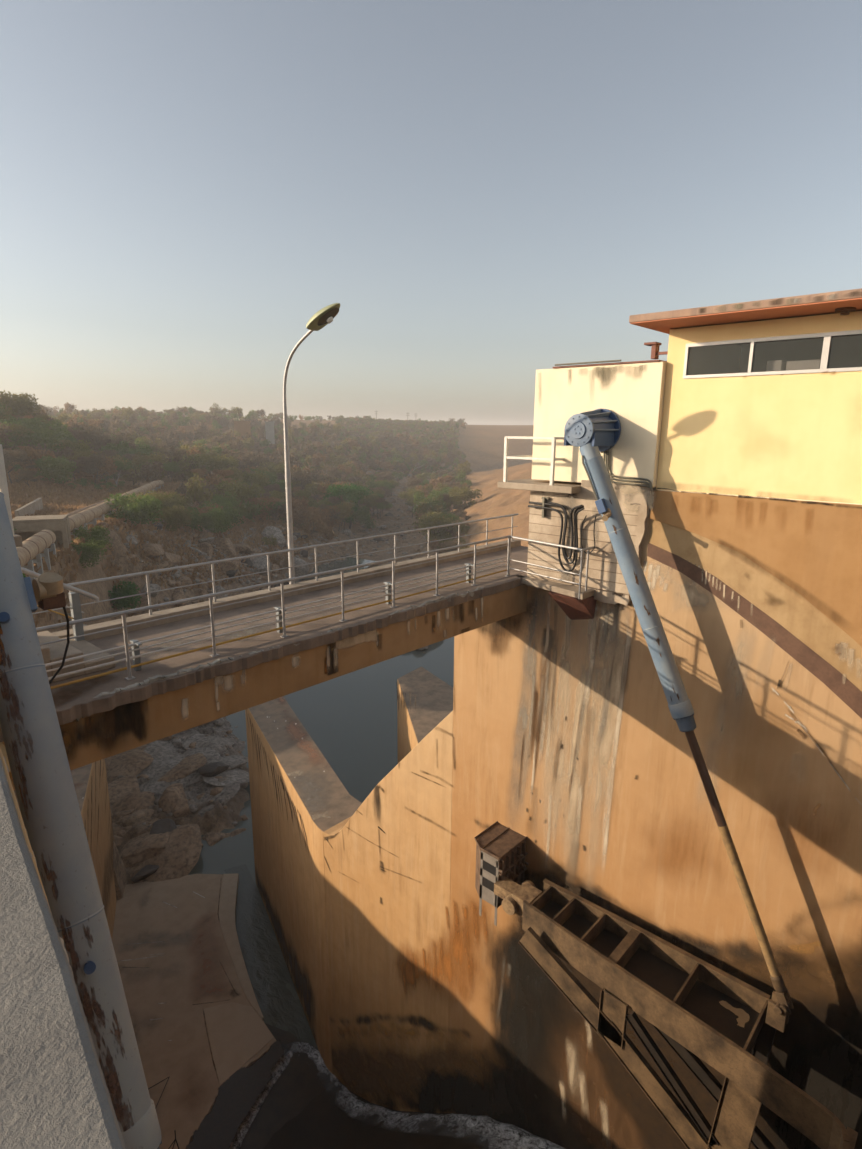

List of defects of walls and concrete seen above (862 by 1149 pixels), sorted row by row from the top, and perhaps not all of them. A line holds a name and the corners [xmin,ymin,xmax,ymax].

damp [432,594,630,868]
crack [772,680,862,805]
corrosion [397,903,487,994]
damp [524,870,718,955]
damp [338,1016,438,1039]
damp [560,1048,584,1103]